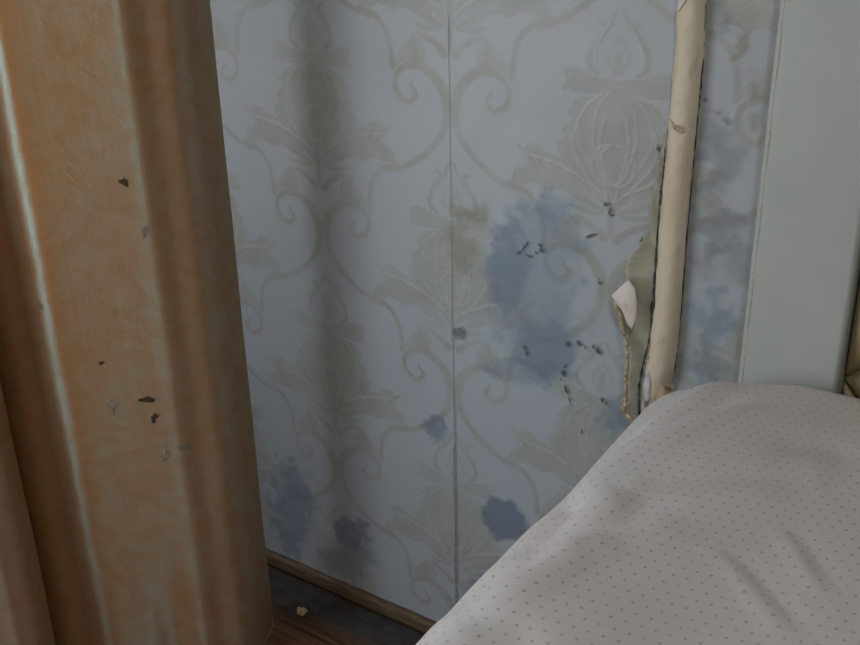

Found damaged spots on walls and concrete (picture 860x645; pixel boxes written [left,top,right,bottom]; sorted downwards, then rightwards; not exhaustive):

peeling [611,280,637,330]
water stain [483,499,527,540]